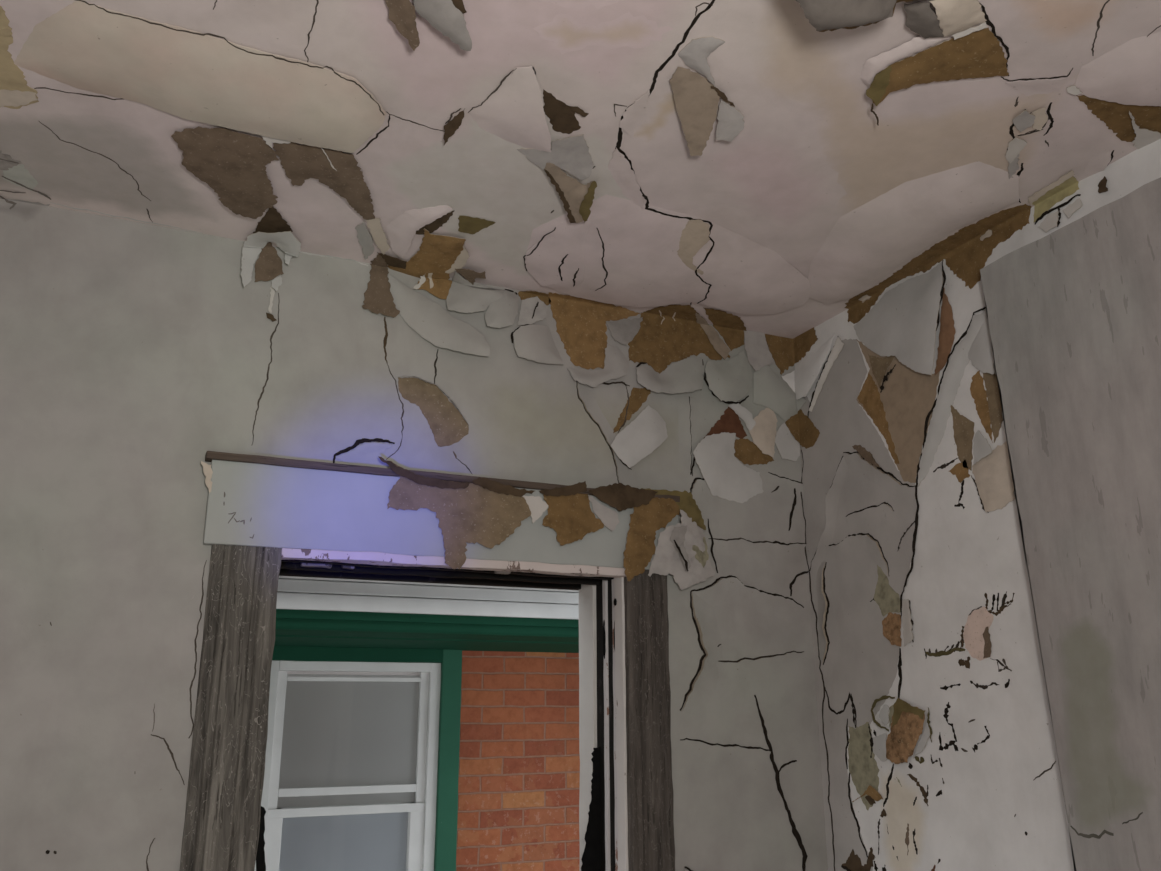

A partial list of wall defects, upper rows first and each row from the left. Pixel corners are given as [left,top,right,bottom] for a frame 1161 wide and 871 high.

crack [39,121,152,221]
crack [608,0,715,305]
peeling [796,0,1010,126]
crack [1001,0,1110,96]
peeling [1067,85,1161,149]
peeling [171,126,496,363]
crack [252,293,280,444]
crack [333,364,404,464]
peeling [398,349,469,447]
peeling [378,456,706,581]
peeling [443,66,1082,871]
crack [680,260,987,871]